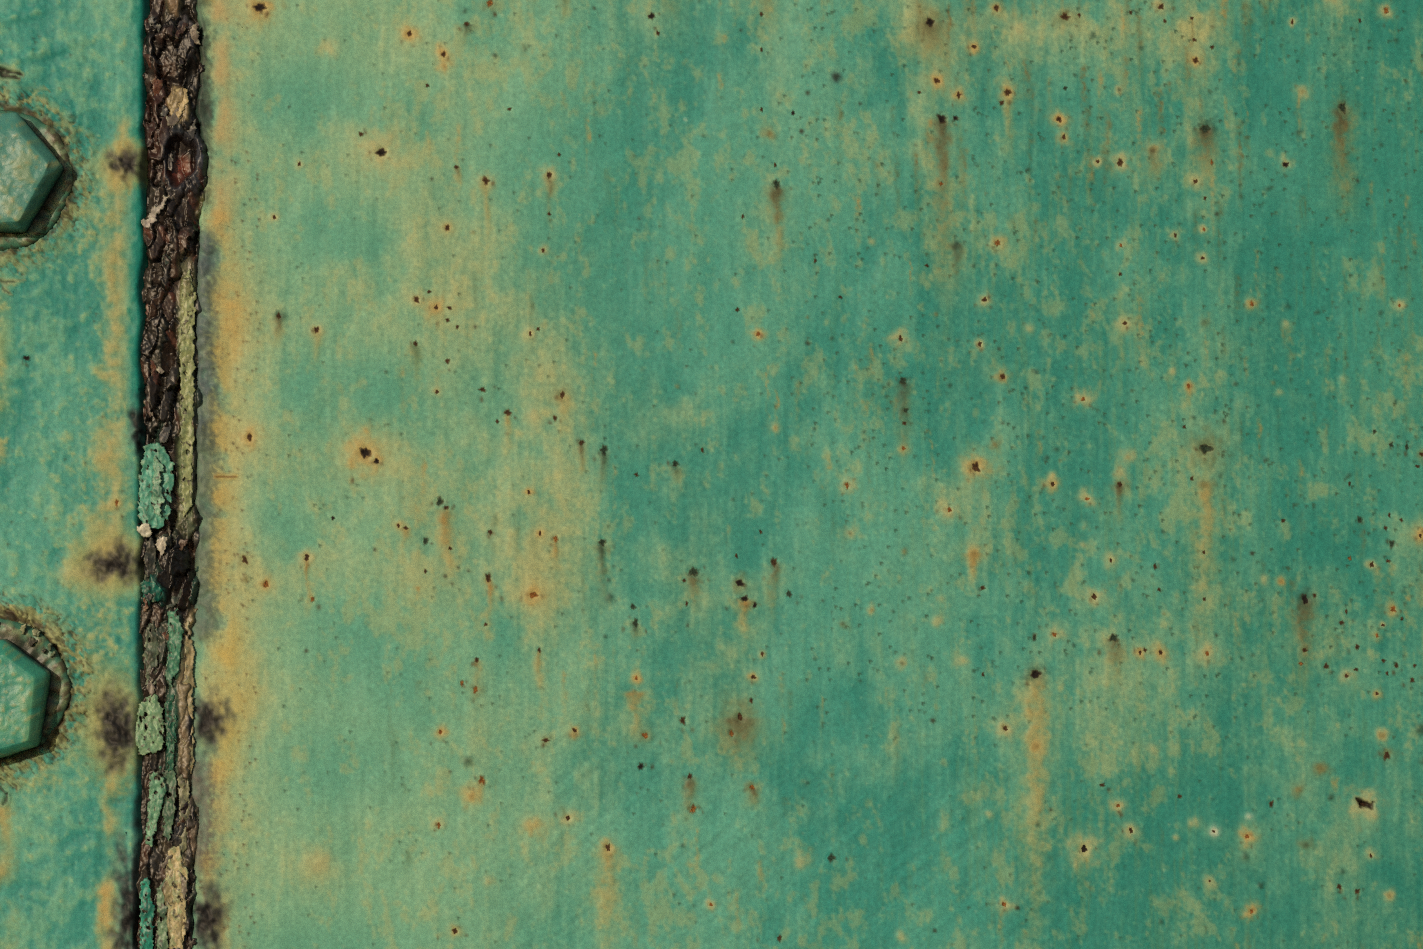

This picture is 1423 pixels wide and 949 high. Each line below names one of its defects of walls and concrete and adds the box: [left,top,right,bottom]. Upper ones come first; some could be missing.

peeling [0,75,105,287]
rust [762,177,791,261]
rust [904,0,1010,310]
rust [994,77,1026,156]
rust [1290,80,1384,214]
rust [327,417,399,487]
rust [936,436,1006,526]
rust [961,539,987,583]
rust [1273,572,1324,693]
rust [990,617,1146,940]
rust [1287,722,1423,864]